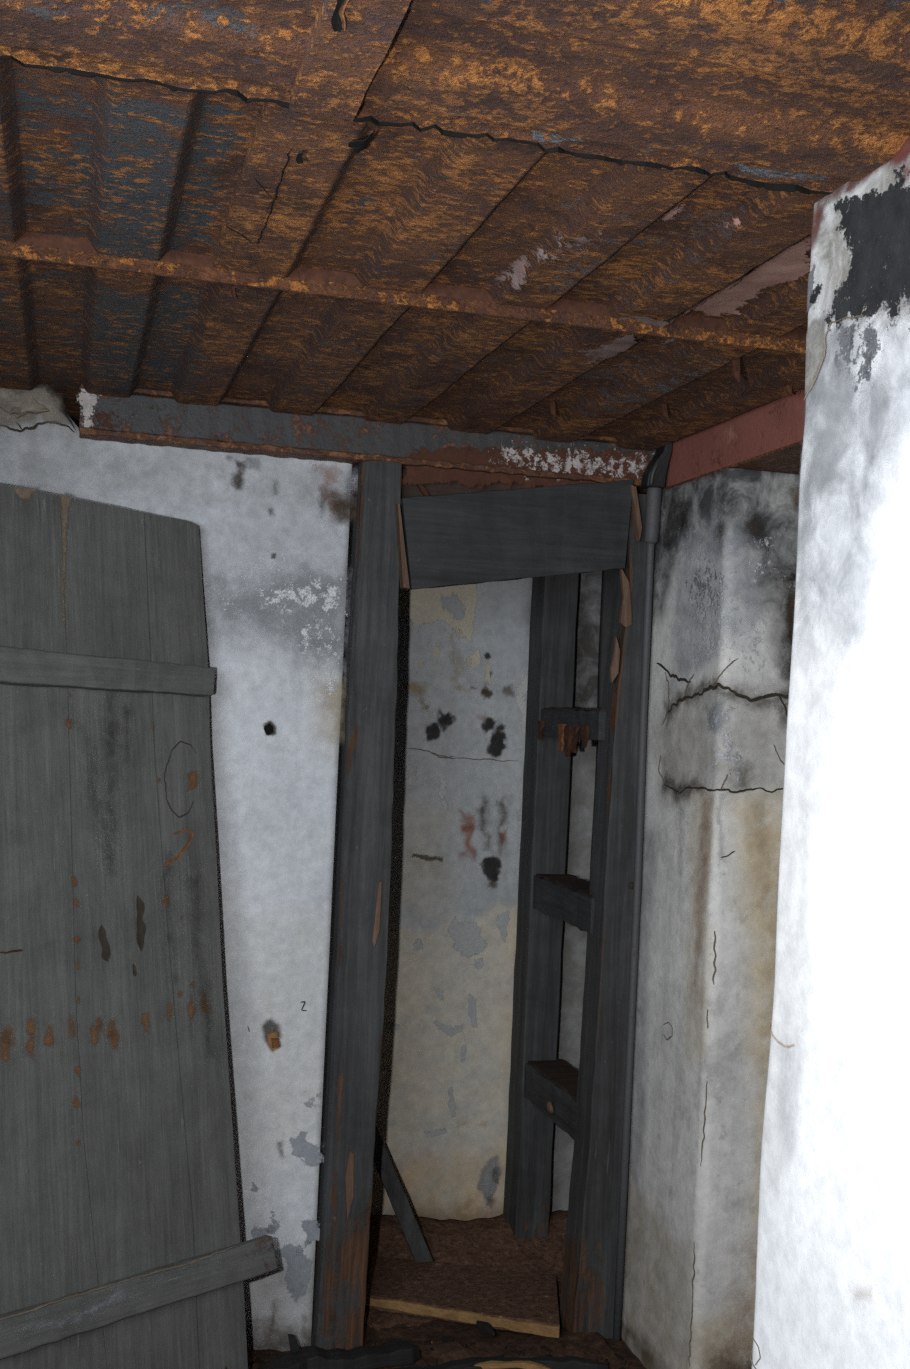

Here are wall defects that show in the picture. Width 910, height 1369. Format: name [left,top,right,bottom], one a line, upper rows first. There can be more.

flaking render [0,387,102,427]
peeling [402,440,654,490]
damp [482,653,513,697]
damp [426,712,452,741]
damp [482,718,506,757]
crack [657,658,789,794]
damp [482,857,501,887]
peeling [289,1131,324,1167]
peeling [251,1211,320,1302]